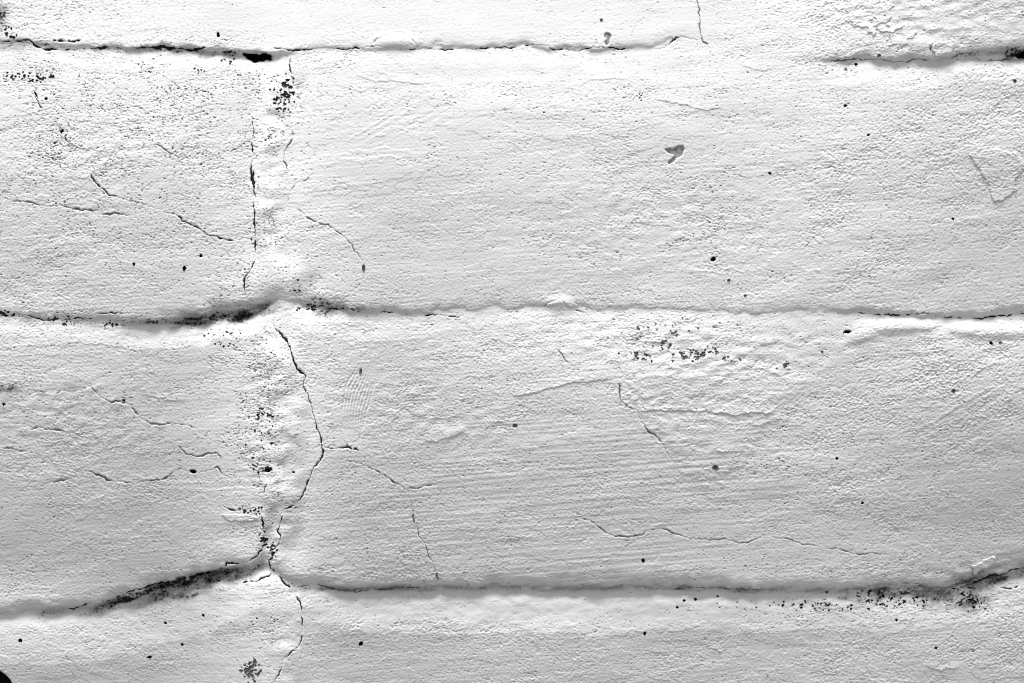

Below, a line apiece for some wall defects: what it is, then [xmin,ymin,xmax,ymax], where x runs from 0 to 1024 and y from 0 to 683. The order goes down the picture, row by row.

crack [275,48,312,83]
peeling [665,146,684,164]
crack [64,175,143,216]
crack [283,140,360,257]
crack [53,329,438,678]